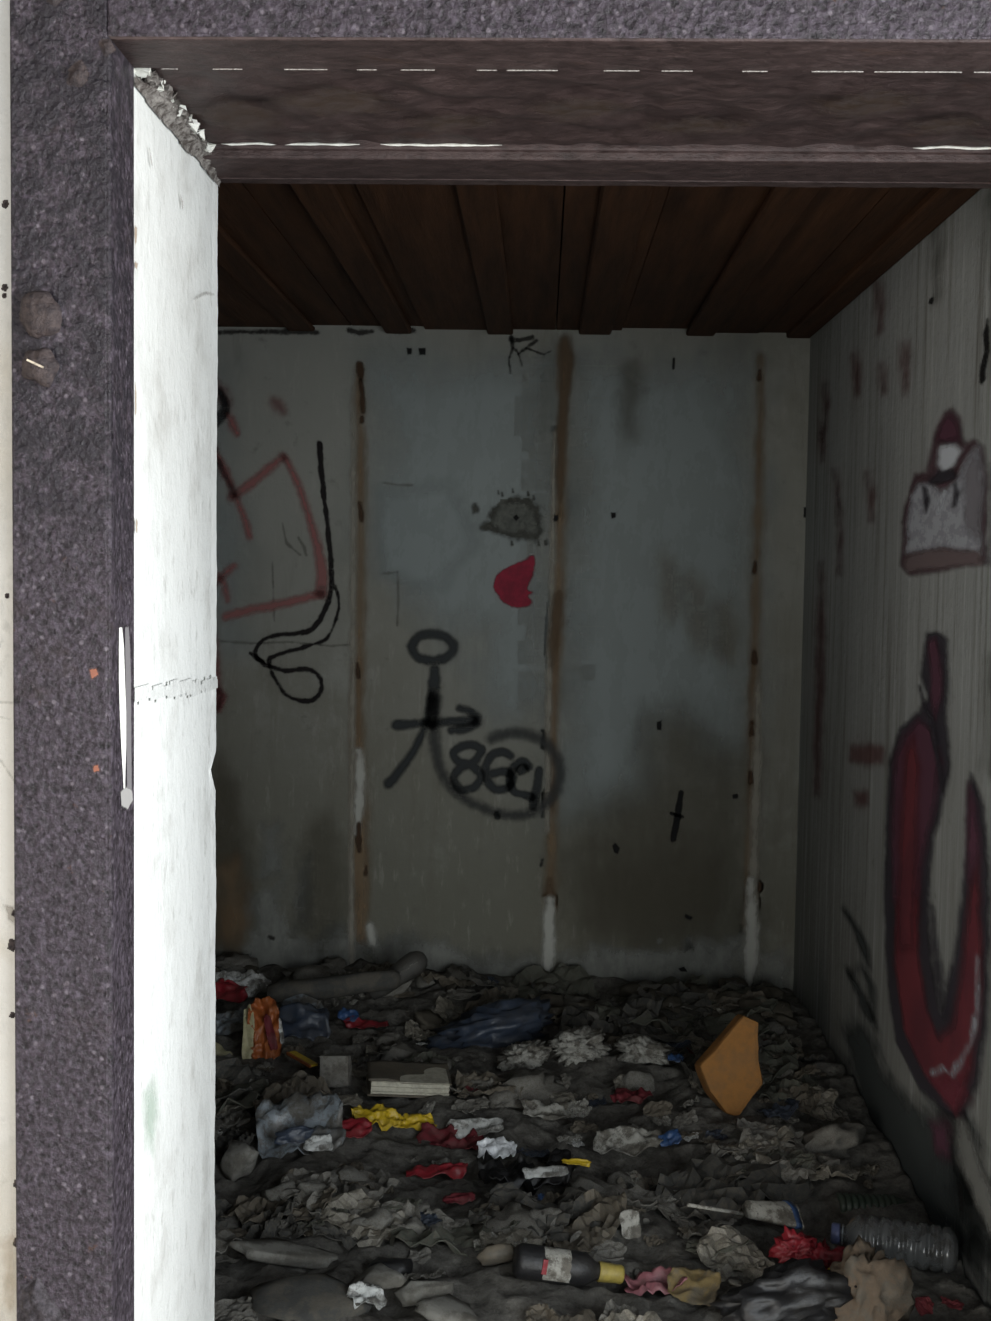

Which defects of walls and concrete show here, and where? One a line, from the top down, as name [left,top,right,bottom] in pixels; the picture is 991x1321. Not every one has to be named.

spalling [134,68,360,188]